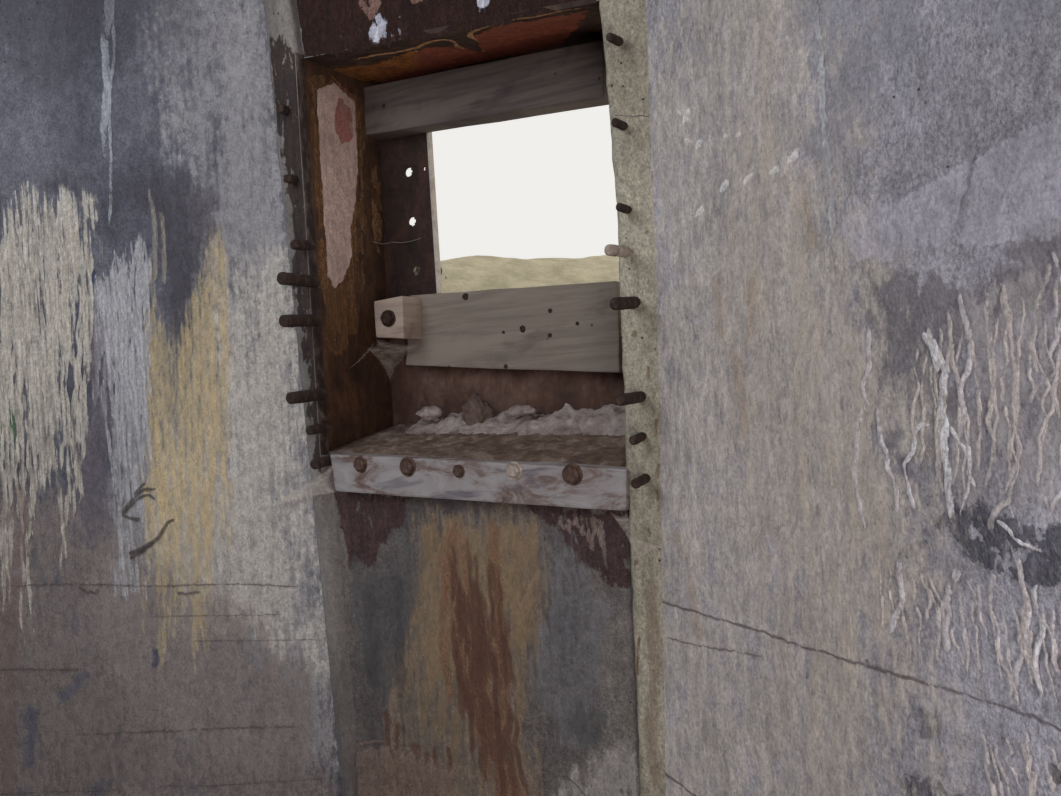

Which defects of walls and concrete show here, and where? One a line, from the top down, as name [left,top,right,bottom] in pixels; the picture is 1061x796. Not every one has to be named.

water stain [0,0,332,796]
rust [269,35,367,474]
peeling [296,0,588,288]
water stain [654,0,1061,796]
rust [438,518,528,796]
crack [662,601,1061,732]